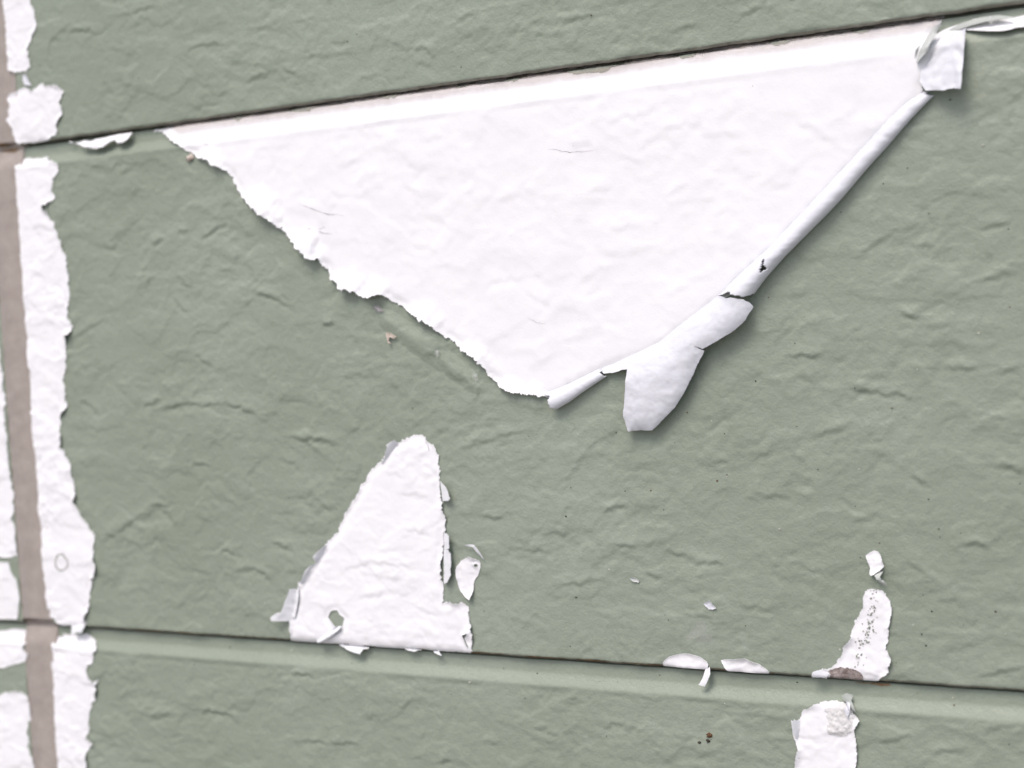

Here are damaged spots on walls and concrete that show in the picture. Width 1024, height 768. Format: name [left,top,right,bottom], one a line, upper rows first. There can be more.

peeling [2,0,64,145]
peeling [154,15,1024,432]
peeling [0,363,28,668]
peeling [0,690,34,768]
peeling [15,157,98,768]
peeling [270,435,484,656]
peeling [663,653,769,687]
peeling [791,693,859,768]
peeling [811,550,892,681]